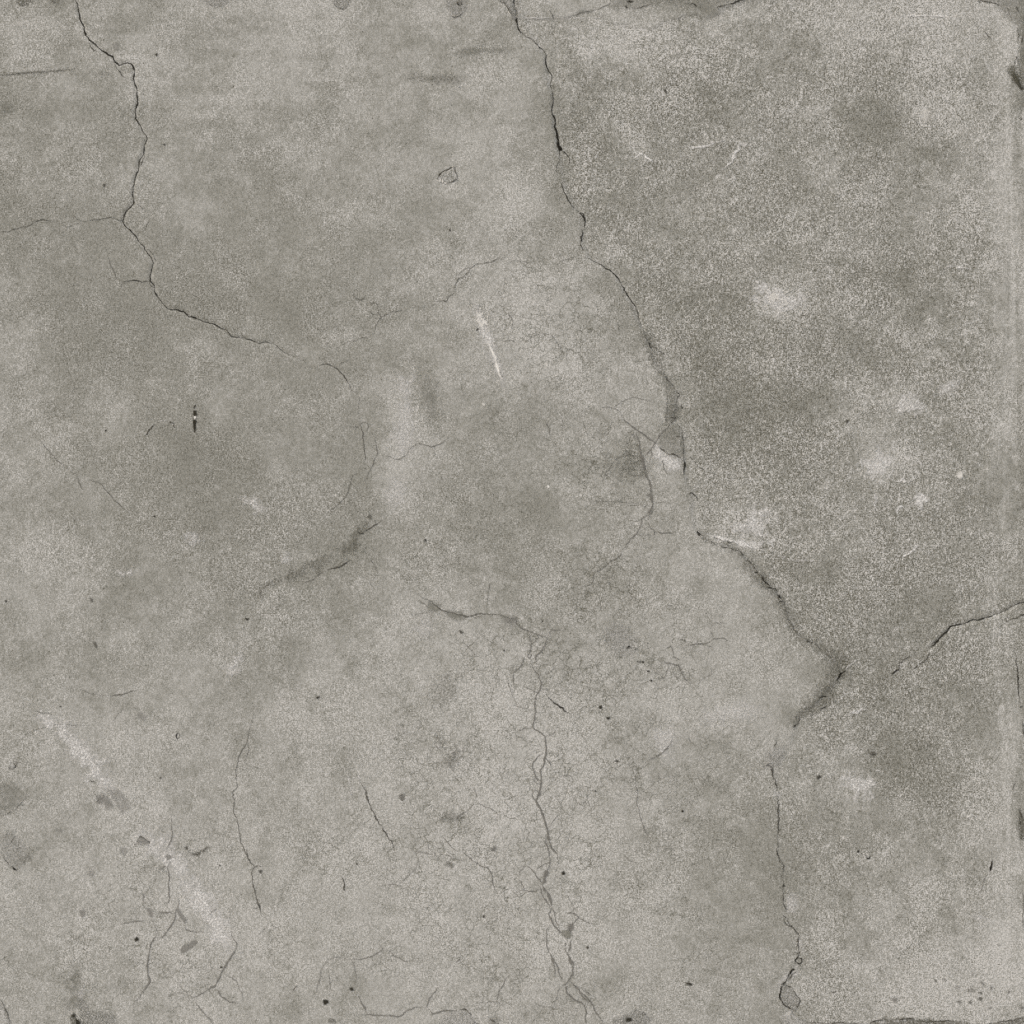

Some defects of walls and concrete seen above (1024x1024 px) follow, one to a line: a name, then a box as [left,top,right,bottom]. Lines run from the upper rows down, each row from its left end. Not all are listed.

crack [75,0,350,385]
crack [509,0,639,319]
crack [591,380,697,584]
crack [664,638,718,681]
crack [892,602,1024,674]
crack [357,987,456,1017]
crack [422,597,602,1023]
crack [771,744,802,1009]